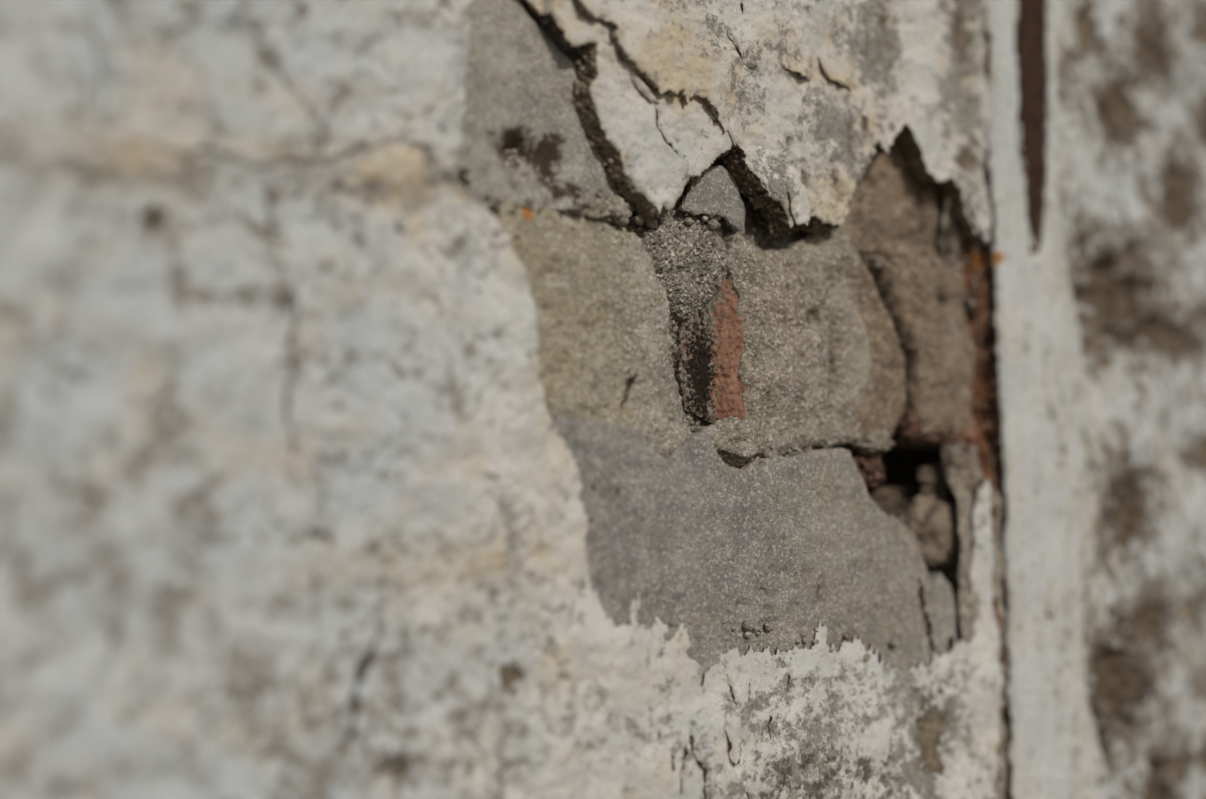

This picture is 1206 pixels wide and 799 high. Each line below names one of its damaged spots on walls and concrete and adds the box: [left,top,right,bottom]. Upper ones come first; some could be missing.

crack [727,3,753,69]
spalling [451,0,995,687]
spalling [499,650,523,694]
spalling [911,684,949,791]